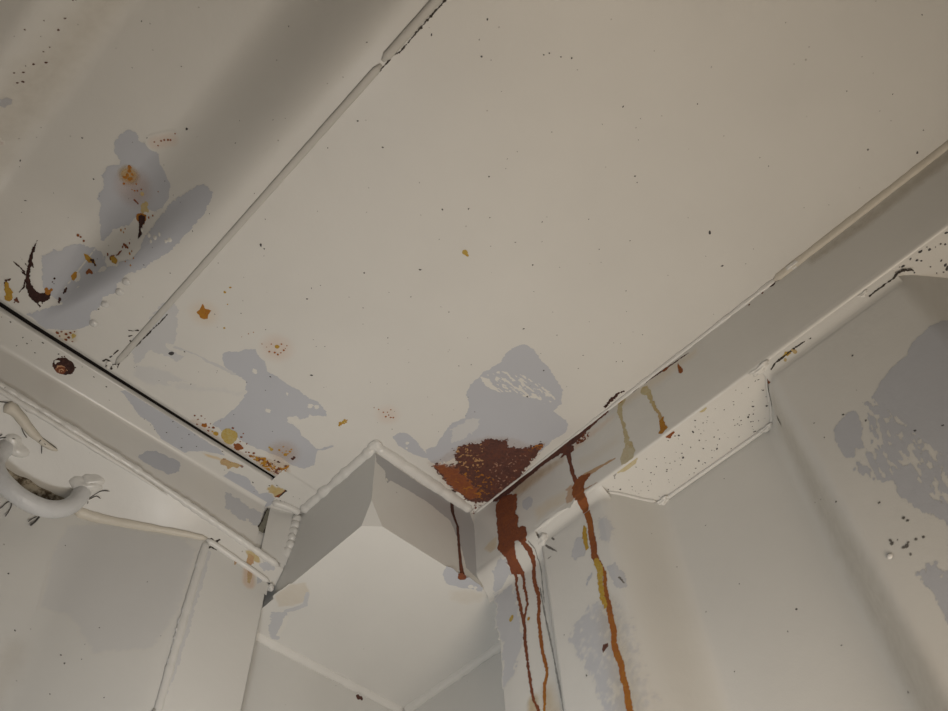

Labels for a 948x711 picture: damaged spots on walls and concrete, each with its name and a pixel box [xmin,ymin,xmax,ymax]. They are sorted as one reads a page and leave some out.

rust [122,165,137,192]
rust [4,279,19,303]
rust [71,254,97,282]
peeling [26,130,213,330]
rust [107,228,134,266]
rust [52,356,76,375]
peeling [173,346,333,469]
peeling [393,344,568,464]
peeling [834,320,948,526]
rust [431,346,701,711]
peeling [887,536,925,560]
peeling [916,561,948,624]